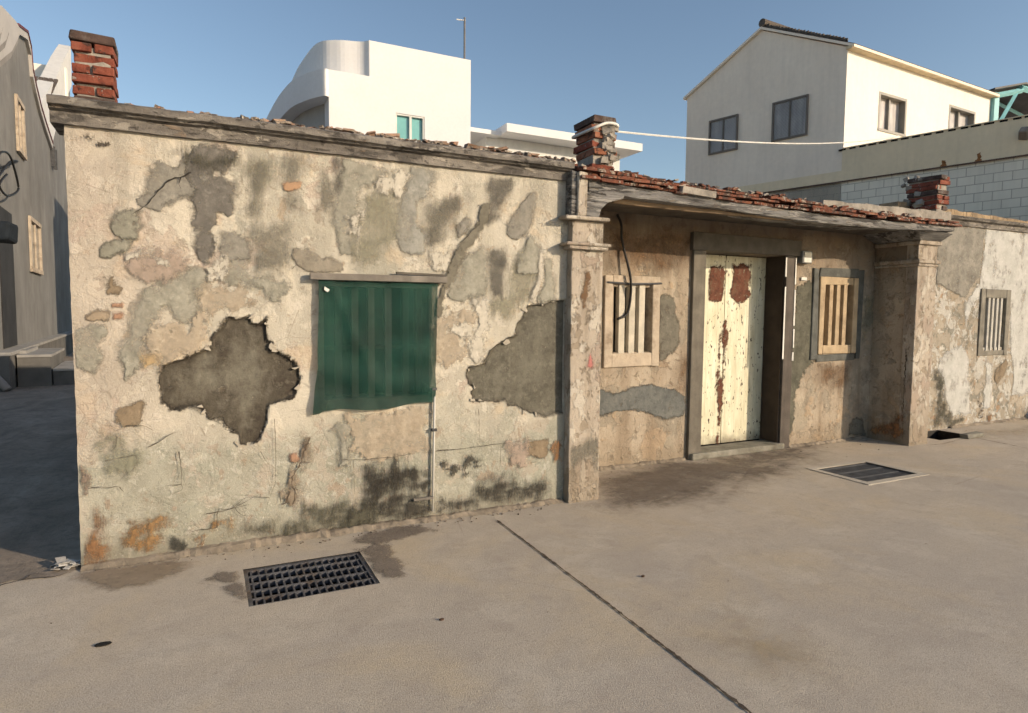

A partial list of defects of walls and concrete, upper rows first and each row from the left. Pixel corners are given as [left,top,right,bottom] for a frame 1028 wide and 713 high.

crack [134,172,191,213]
spalling [142,235,303,447]
spalling [436,249,564,417]
peeling [938,229,1028,419]
damp [249,455,547,536]